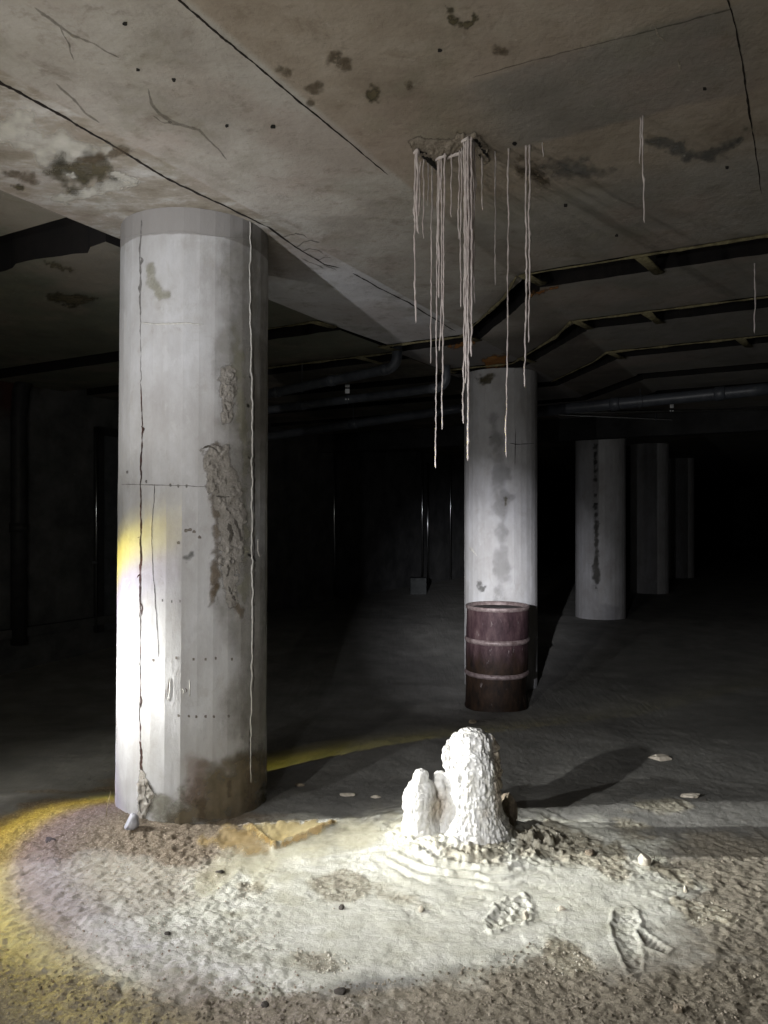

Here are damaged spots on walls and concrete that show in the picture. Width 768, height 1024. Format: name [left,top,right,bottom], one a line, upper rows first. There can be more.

leakage [0,109,138,205]
crack [0,81,455,331]
crack [178,0,388,175]
spalling [408,132,490,170]
leakage [646,138,742,162]
spalling [218,365,238,424]
leakage [231,273,265,438]
crack [137,220,159,771]
spalling [200,444,247,608]
leakage [592,445,600,584]
leakage [150,453,267,825]
spalling [136,770,157,819]